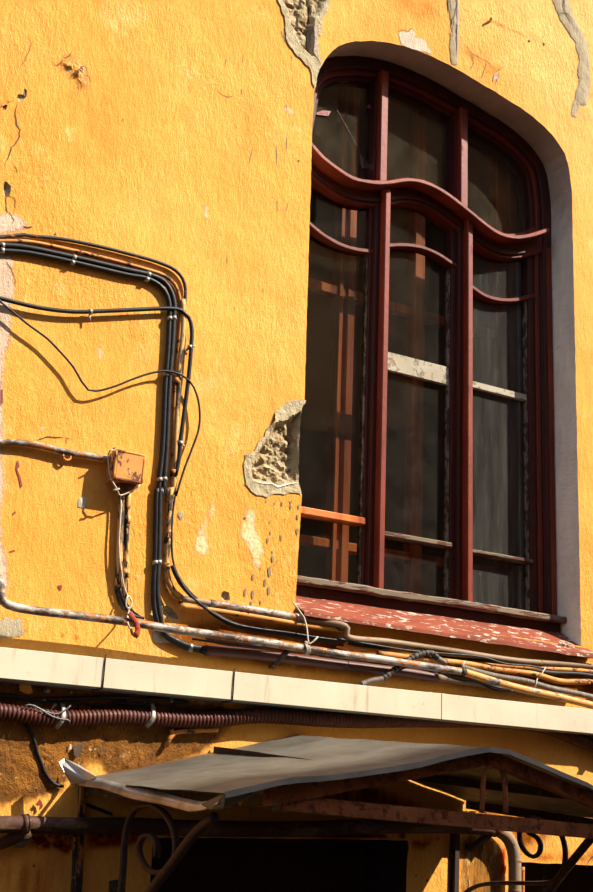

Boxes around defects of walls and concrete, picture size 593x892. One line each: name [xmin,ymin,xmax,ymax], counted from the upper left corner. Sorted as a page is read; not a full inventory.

spalling [278,0,330,88]
peeling [397,28,431,54]
peeling [0,253,16,587]
spalling [244,399,306,497]
peeling [195,505,214,555]
peeling [241,509,263,566]
peeling [0,617,24,638]